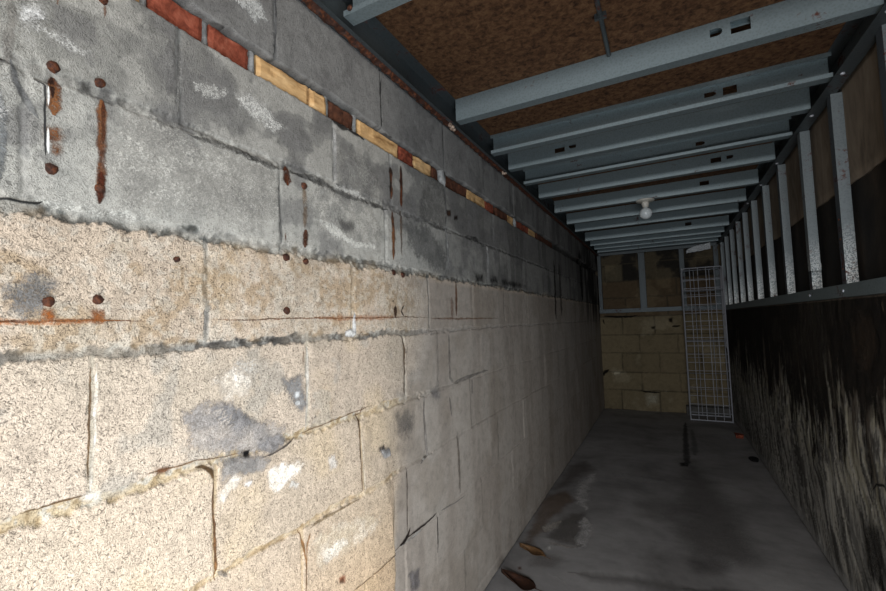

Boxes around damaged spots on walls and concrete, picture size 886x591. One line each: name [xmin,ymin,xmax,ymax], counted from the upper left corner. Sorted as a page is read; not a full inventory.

crack [0,0,50,205]
corrosion [46,77,62,116]
corrosion [46,127,61,154]
corrosion [96,99,107,204]
corrosion [0,310,130,325]
damp [214,359,257,401]
damp [726,296,886,591]
crack [22,495,84,514]